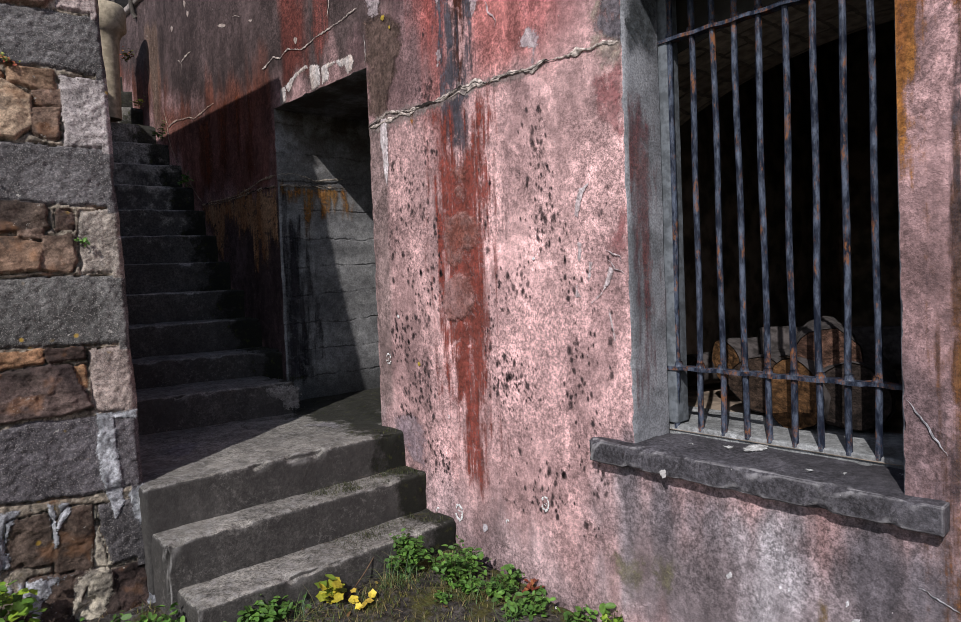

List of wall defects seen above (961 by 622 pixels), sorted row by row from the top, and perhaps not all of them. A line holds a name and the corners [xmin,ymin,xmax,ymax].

crack [262,0,356,69]
damp [365,0,380,17]
damp [369,0,547,184]
crack [368,40,618,129]
corrosion [895,0,924,178]
corrosion [203,183,352,271]
damp [282,213,324,384]
corrosion [426,97,502,493]
corrosion [935,179,961,481]
damp [96,409,144,524]
damp [0,510,20,575]
damp [6,503,116,622]